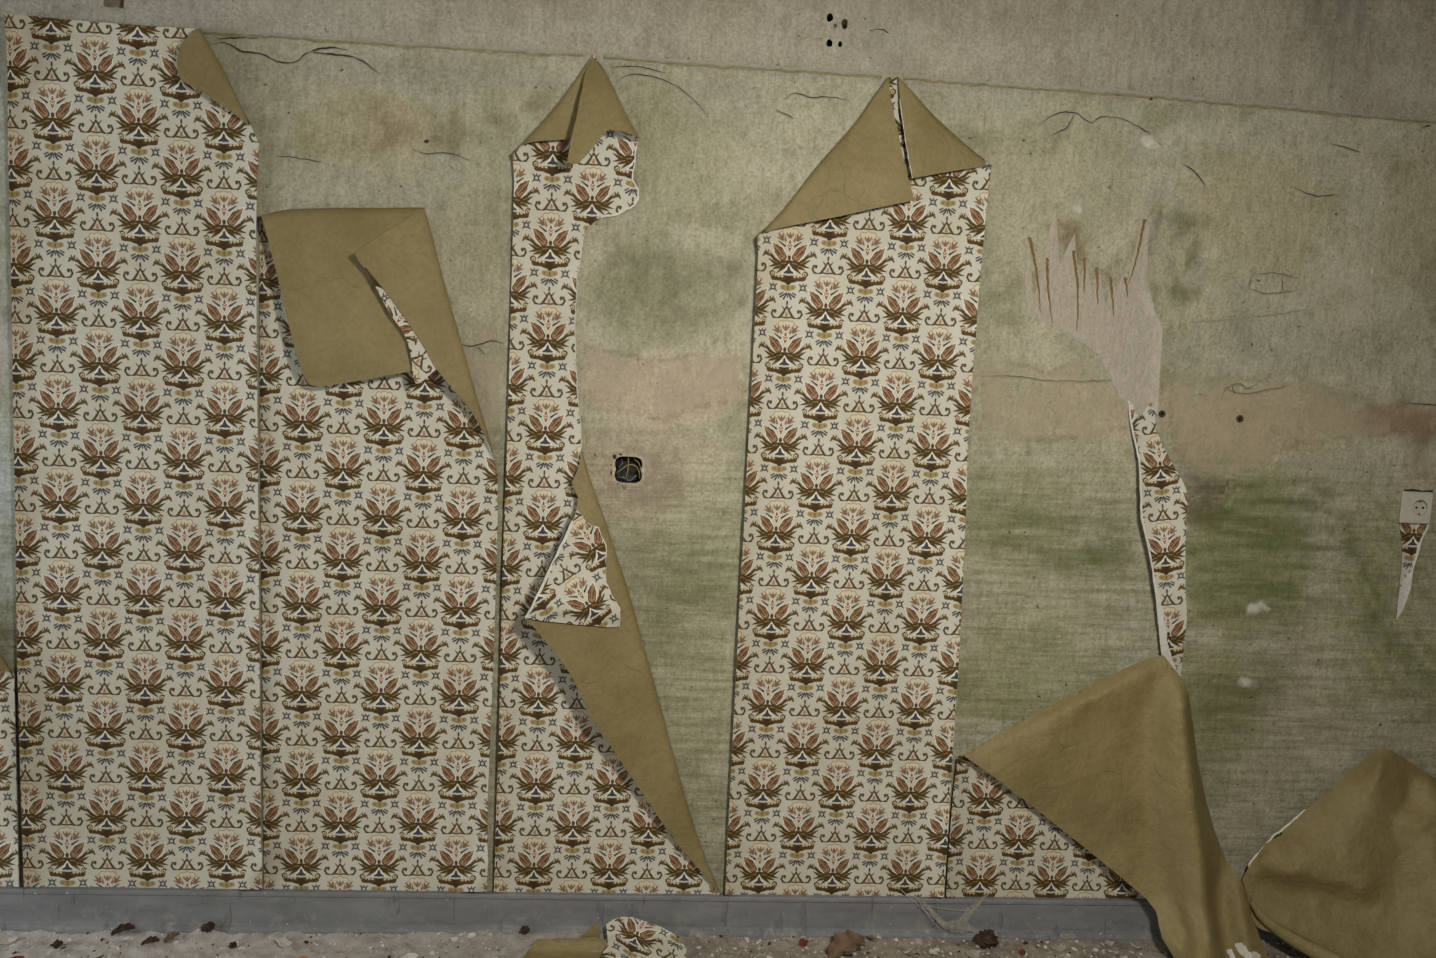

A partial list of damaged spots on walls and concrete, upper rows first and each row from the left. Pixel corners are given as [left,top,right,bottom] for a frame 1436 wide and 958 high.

peeling [526,450,721,894]
peeling [1226,942,1261,958]